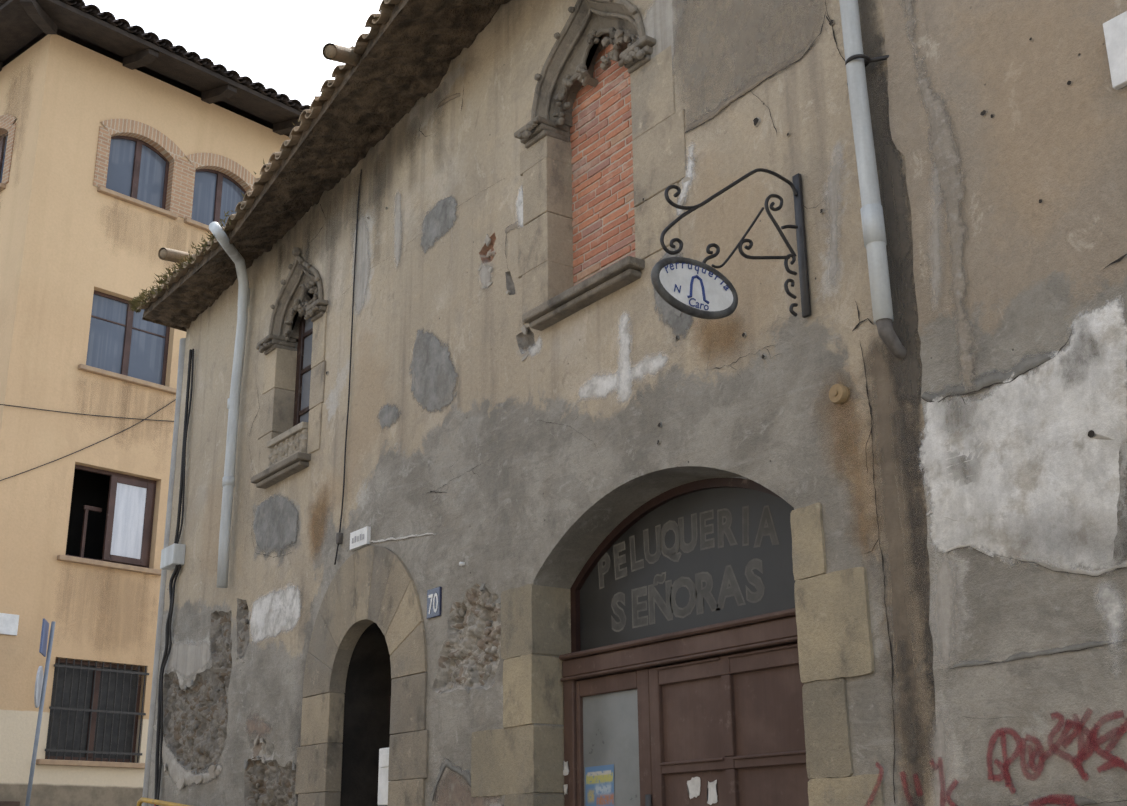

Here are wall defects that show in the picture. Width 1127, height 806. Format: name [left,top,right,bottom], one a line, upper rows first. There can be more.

spalling [478,232,515,295]
damp [859,0,954,806]
peeling [920,300,1127,570]
spalling [153,598,251,790]
spalling [244,735,298,806]
spalling [432,583,501,694]
crack [852,299,895,802]